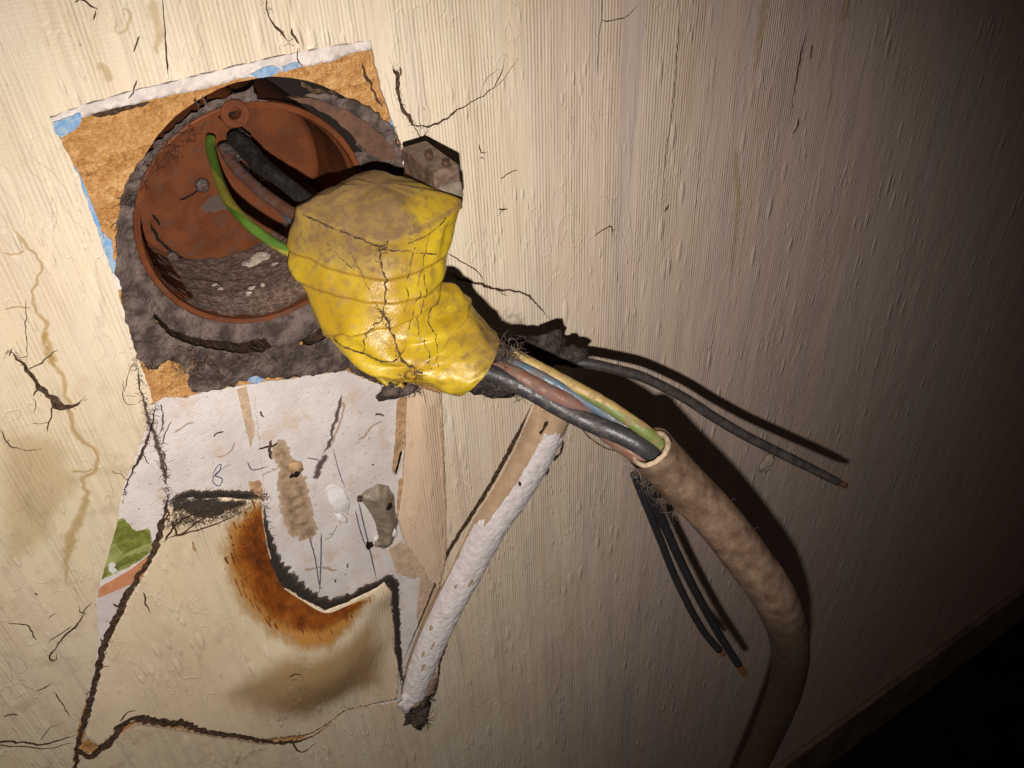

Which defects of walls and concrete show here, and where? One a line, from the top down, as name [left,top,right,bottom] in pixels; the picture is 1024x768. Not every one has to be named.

crack [261,0,302,66]
crack [393,56,517,138]
spalling [50,40,399,306]
crack [1,300,86,451]
crack [112,362,159,504]
spalling [154,313,272,354]
spalling [300,330,327,346]
crack [448,253,551,317]
crack [0,494,330,768]
peeling [77,360,440,753]
corrosion [224,500,371,649]